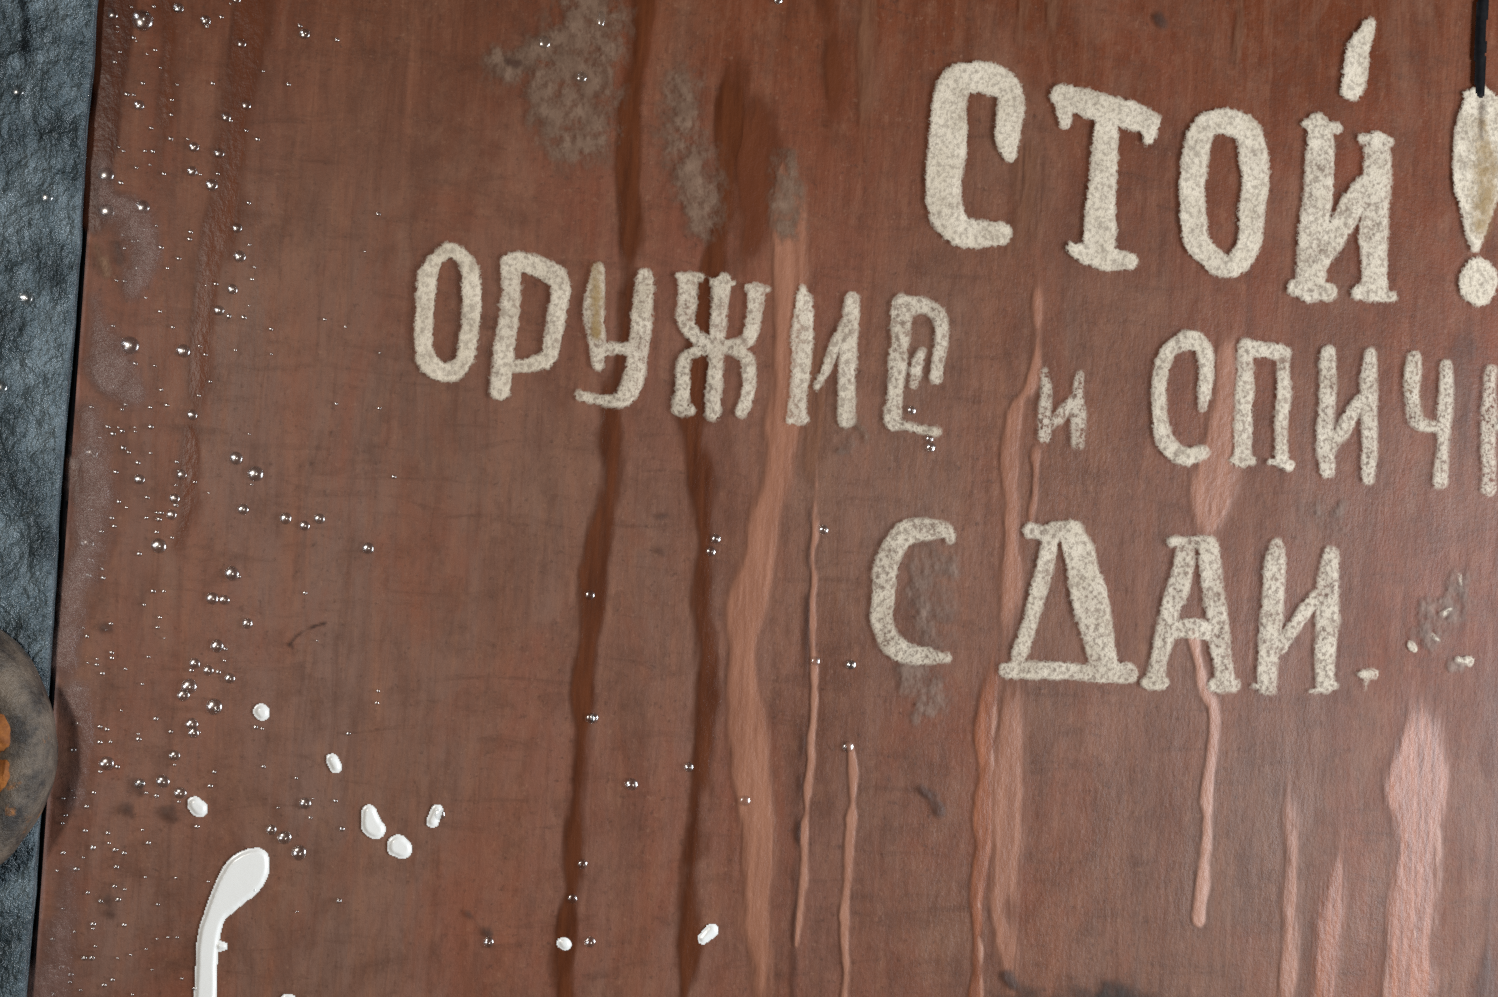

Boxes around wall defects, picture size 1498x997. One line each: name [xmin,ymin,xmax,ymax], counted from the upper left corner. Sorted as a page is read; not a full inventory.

leakage [657,66,721,239]
leakage [726,150,869,997]
leakage [1000,286,1043,633]
leakage [969,668,1024,997]